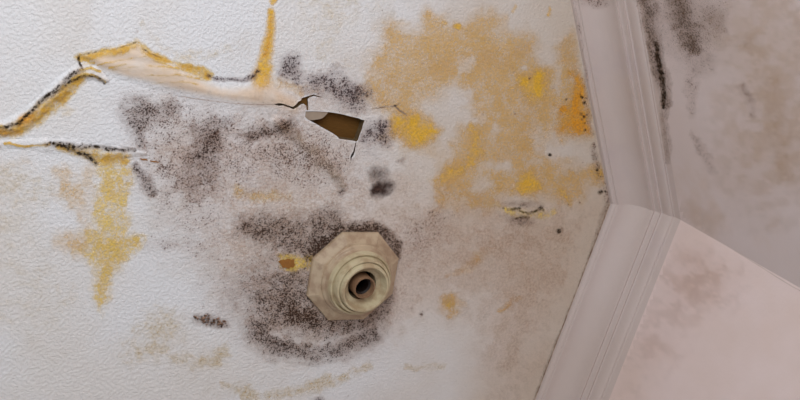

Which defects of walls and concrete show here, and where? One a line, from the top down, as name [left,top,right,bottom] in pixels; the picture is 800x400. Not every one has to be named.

leakage [46,15,609,305]
flaking render [305,111,364,141]
leakage [638,0,725,117]
leakage [197,206,408,364]